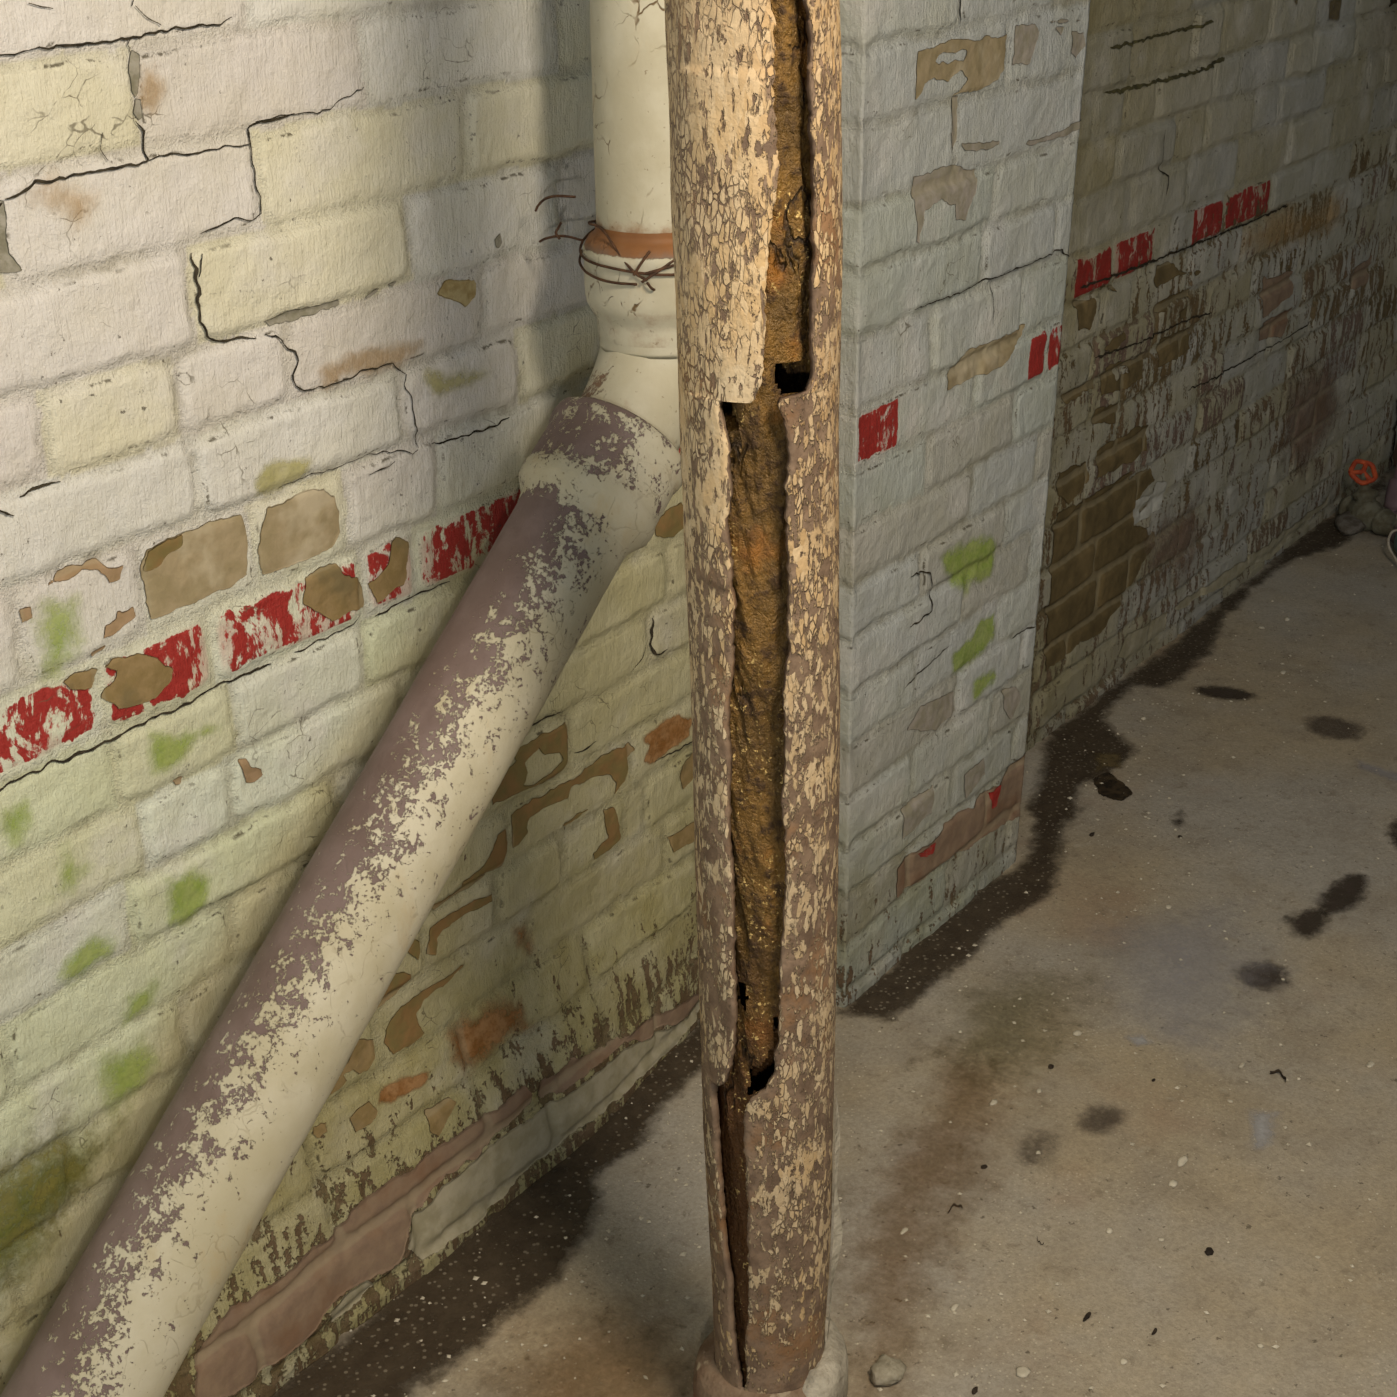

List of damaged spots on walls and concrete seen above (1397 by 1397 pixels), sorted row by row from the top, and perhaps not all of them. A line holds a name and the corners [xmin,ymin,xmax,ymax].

crack [0,0,232,56]
peeling [911,19,1086,243]
crack [1110,19,1214,49]
crack [1104,57,1225,94]
crack [5,87,509,488]
peeling [48,558,123,585]
peeling [63,489,409,709]
peeling [1043,261,1201,671]
damp [841,512,1350,1020]
damp [1310,717,1358,738]
peeling [330,722,635,1094]
damp [1285,874,1365,935]